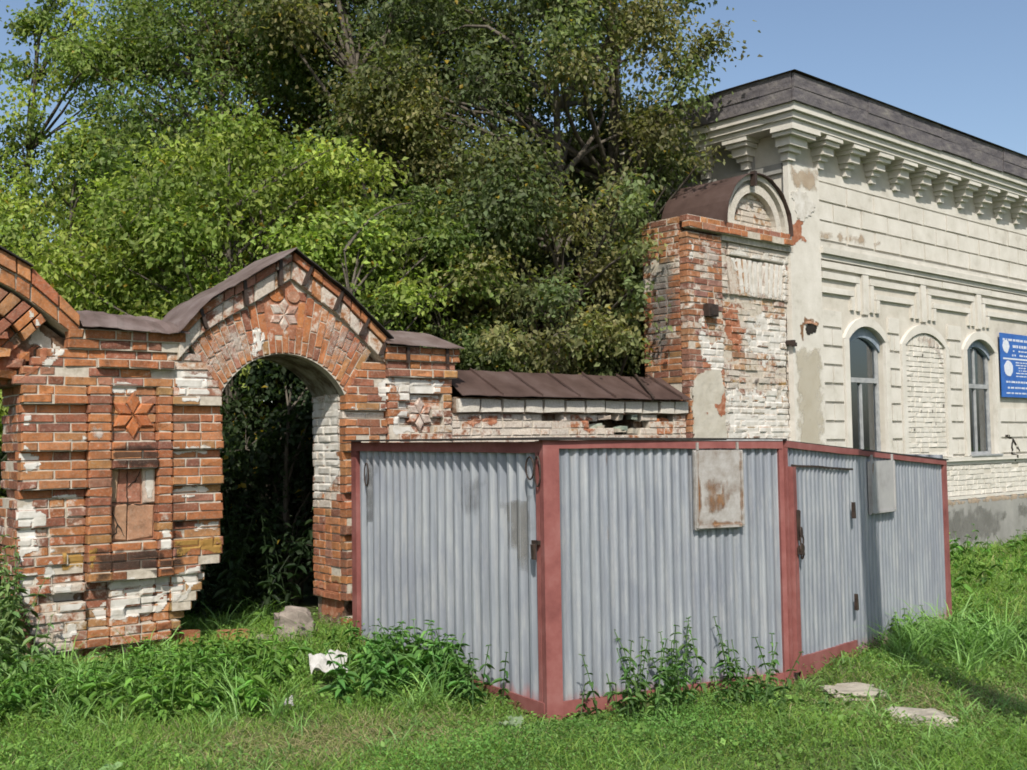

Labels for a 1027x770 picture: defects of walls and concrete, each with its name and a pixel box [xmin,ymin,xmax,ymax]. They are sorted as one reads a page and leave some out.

peeling [689,219,807,371]
flaking render [463,415,500,432]
flaking render [572,414,638,434]
peeling [706,386,791,441]
peeling [193,521,219,531]
damp [507,502,528,560]
rust [697,477,742,527]
peeling [16,504,209,638]